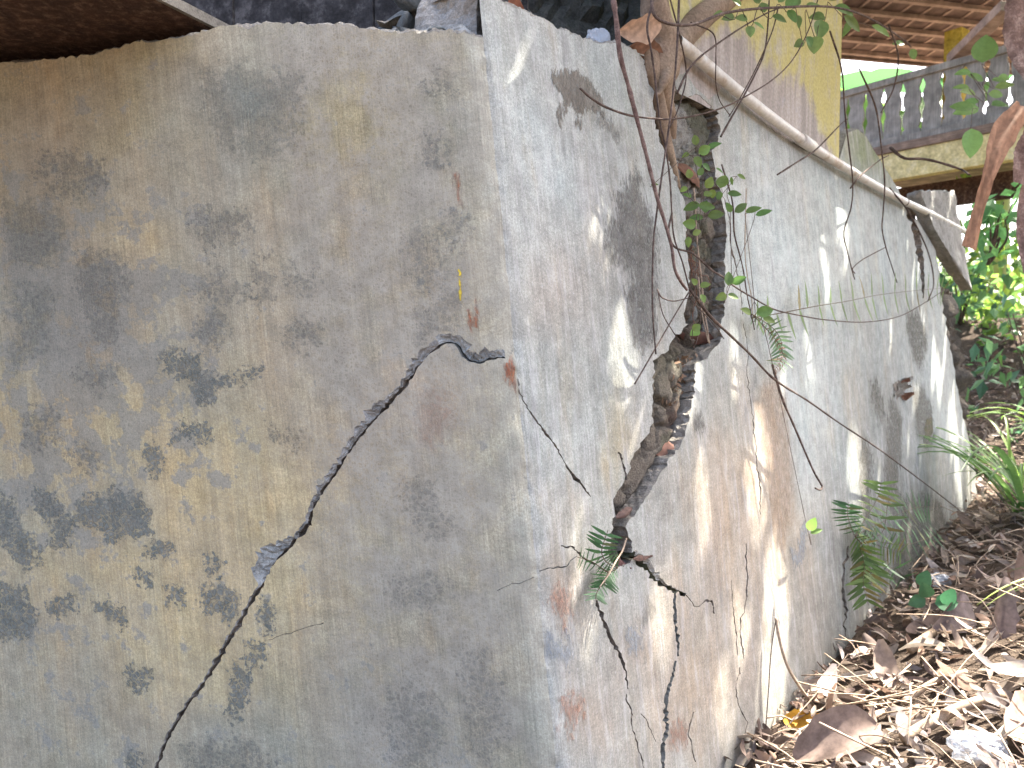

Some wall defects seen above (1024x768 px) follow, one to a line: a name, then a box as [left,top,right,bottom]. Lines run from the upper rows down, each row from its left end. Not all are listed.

crack [154,333,505,768]
rust [505,358,517,386]
crack [499,85,761,768]
water stain [604,160,661,355]